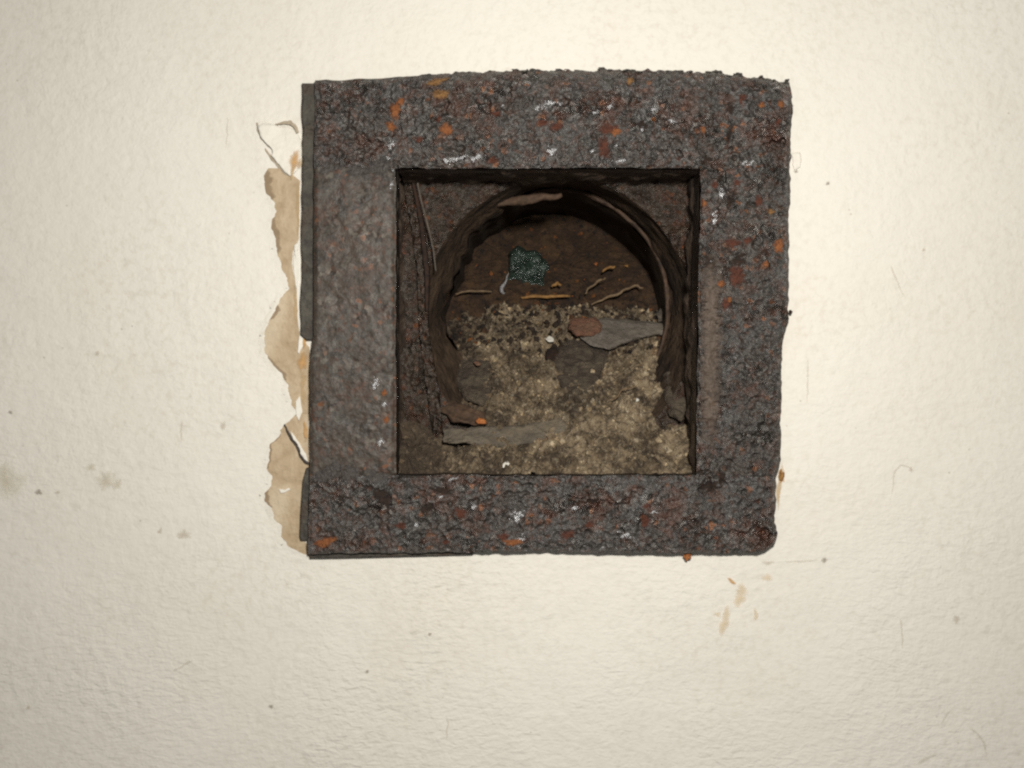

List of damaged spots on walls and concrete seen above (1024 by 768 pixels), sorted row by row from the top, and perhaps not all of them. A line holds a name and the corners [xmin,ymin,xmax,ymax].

peeling [257,123,310,561]